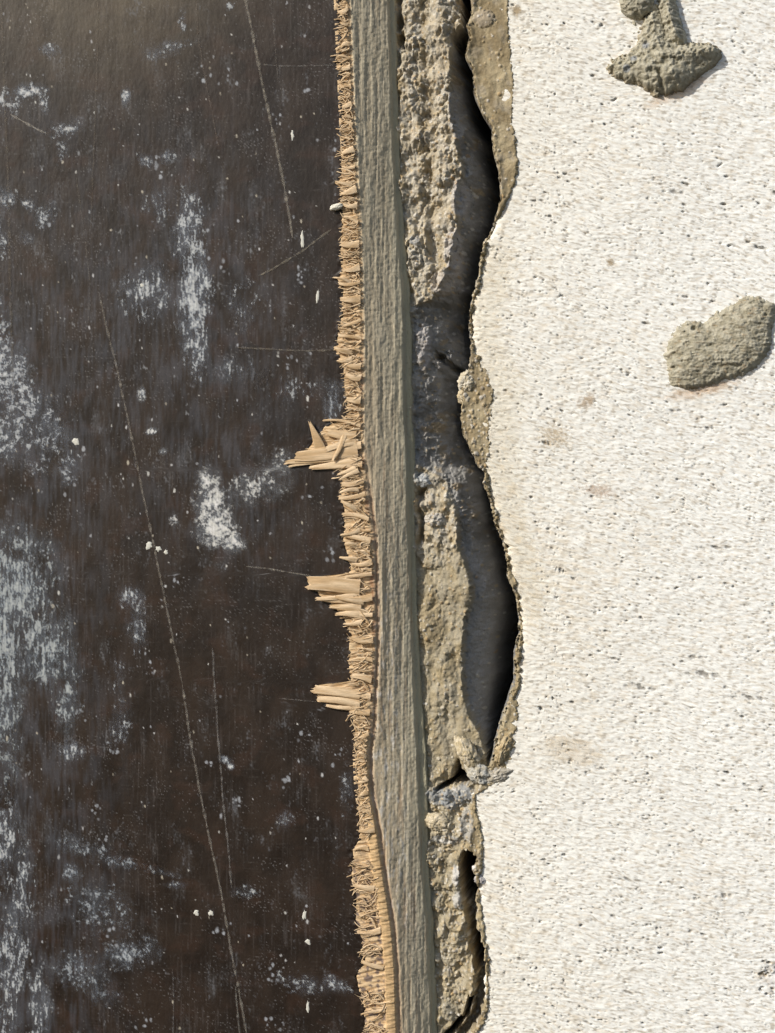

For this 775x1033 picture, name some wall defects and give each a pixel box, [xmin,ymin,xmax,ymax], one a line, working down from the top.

water stain [0,82,48,112]
water stain [1,189,55,227]
water stain [121,195,212,381]
water stain [0,302,80,485]
crack [409,0,523,785]
water stain [194,449,290,549]
water stain [120,588,145,653]
water stain [0,526,135,1033]
water stain [105,937,150,969]
crack [442,849,488,1033]
spalling [744,952,775,1010]